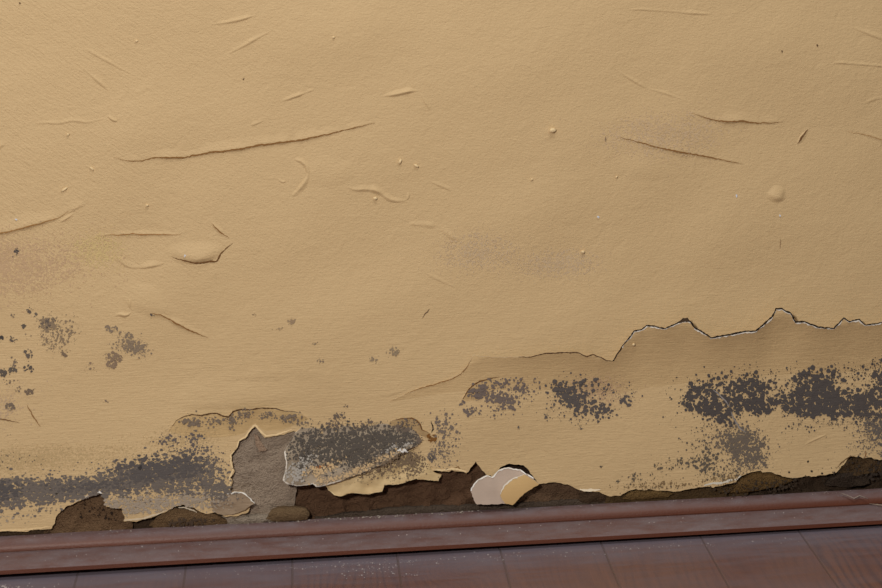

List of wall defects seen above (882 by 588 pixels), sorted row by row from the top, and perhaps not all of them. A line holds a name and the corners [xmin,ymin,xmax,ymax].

damp [0,214,152,357]
damp [103,325,153,369]
peeling [389,309,882,402]
peeling [0,491,196,536]
damp [0,349,648,524]
peeling [169,408,882,524]
damp [609,357,882,494]